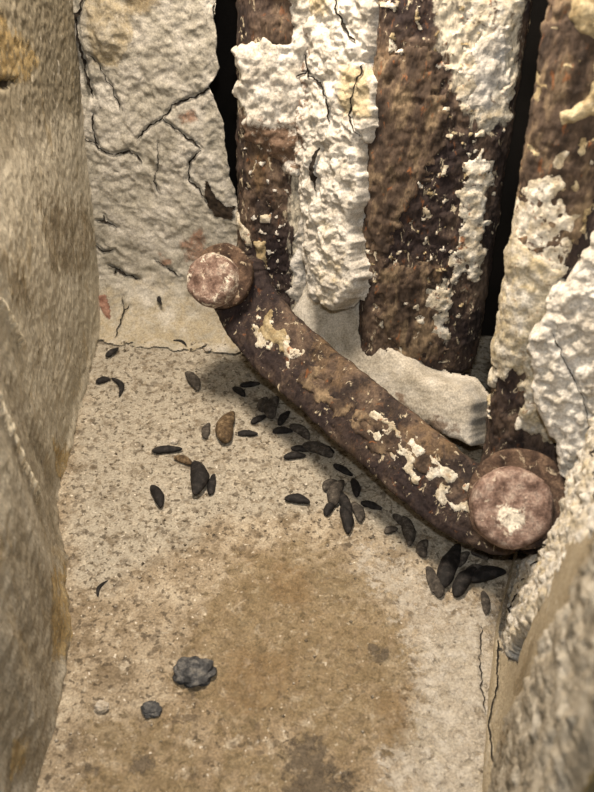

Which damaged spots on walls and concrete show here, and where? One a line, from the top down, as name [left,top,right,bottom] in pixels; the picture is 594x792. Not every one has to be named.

crack [96,245,139,279]
crack [115,299,129,337]
crack [74,0,209,203]
spalling [204,0,252,247]
spalling [481,0,549,337]
water stain [279,734,353,792]
water stain [356,546,502,792]